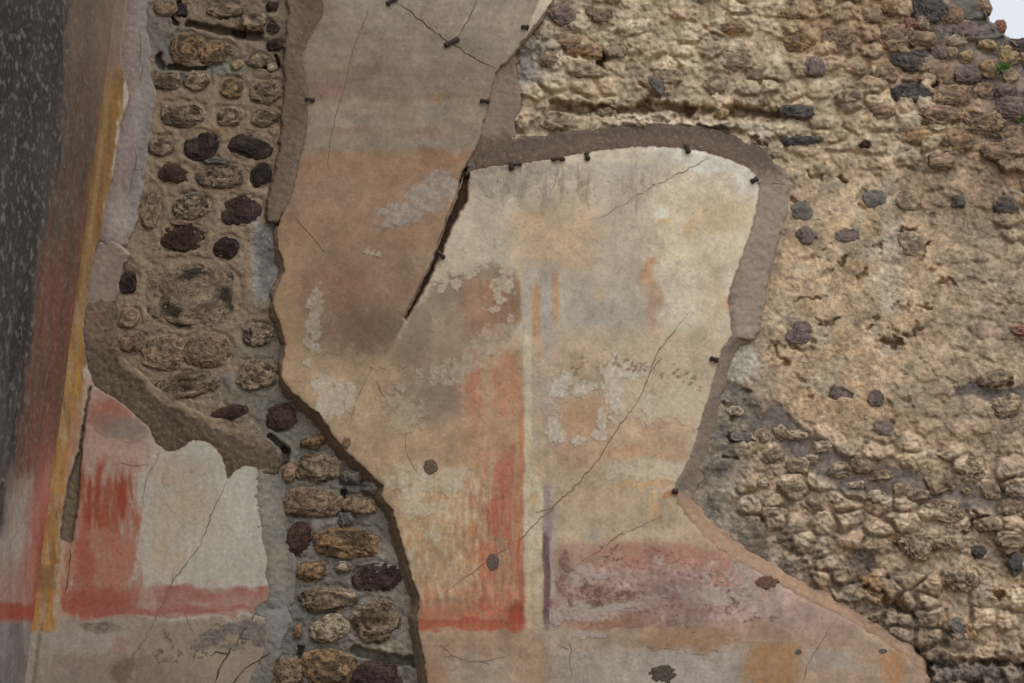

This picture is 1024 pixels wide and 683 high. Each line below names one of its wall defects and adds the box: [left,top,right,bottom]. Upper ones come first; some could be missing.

crack [397,1,493,67]
spalling [115,0,473,683]
crack [396,168,469,332]
peeling [416,257,518,387]
crack [602,157,709,217]
spalling [512,0,1024,683]
crack [447,314,688,591]
crack [117,484,226,682]